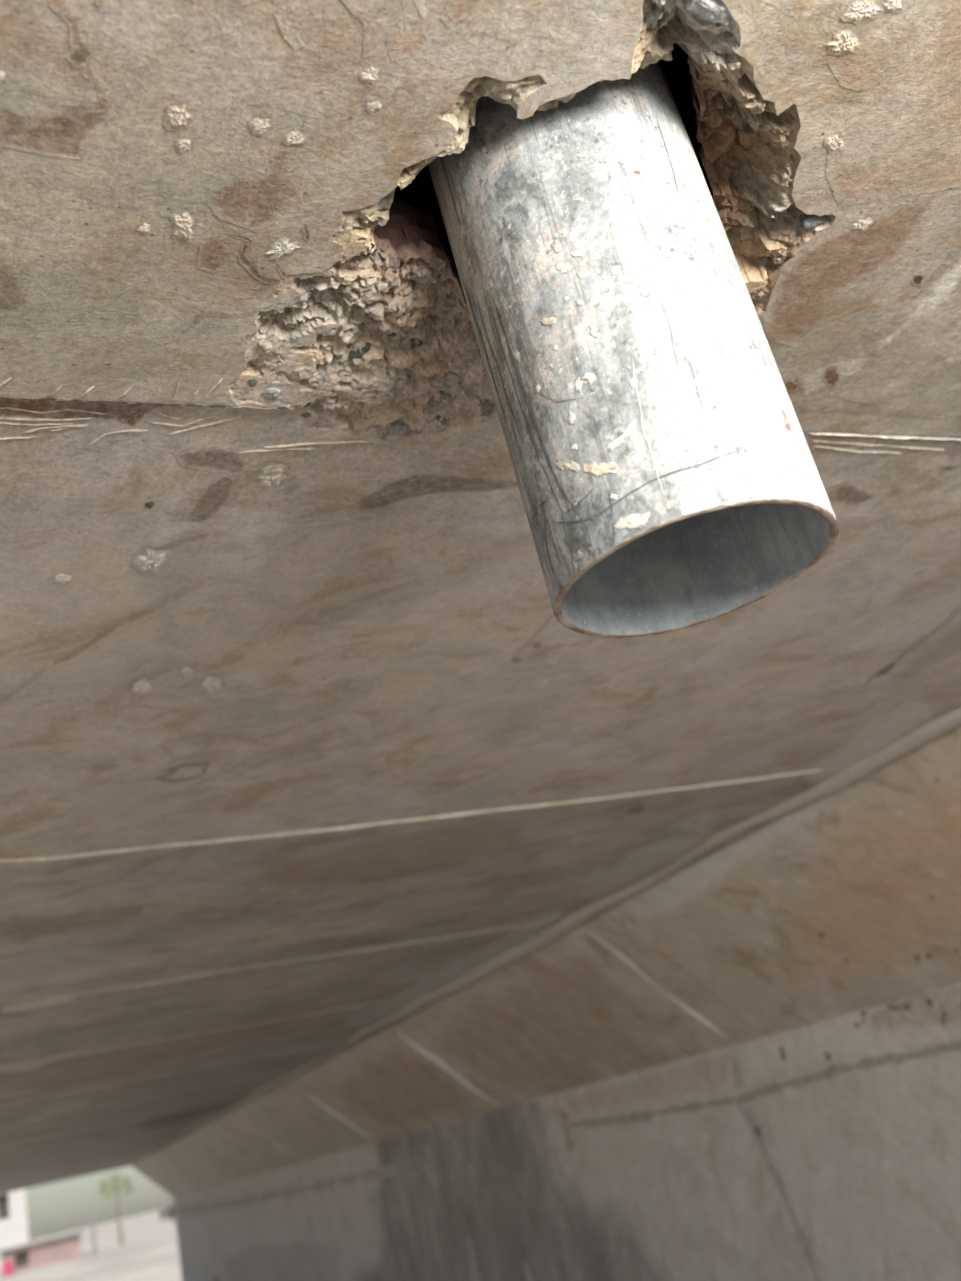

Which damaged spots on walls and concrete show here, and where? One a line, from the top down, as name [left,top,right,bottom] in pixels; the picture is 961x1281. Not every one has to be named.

flaking render [359,64,381,84]
flaking render [824,133,847,153]
spalling [631,0,836,314]
flaking render [850,216,874,231]
spalling [228,74,576,440]